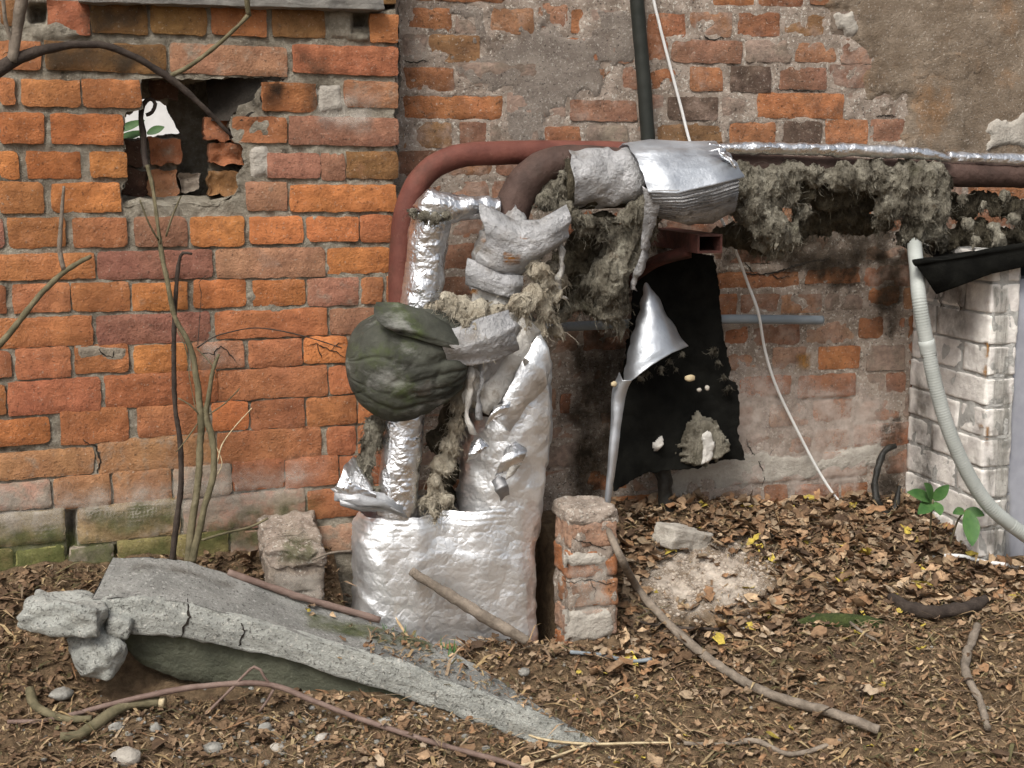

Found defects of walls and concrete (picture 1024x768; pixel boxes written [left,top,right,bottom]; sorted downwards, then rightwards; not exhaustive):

peeling [833,11,858,37]
spalling [121,75,285,207]
leakage [724,231,902,335]
crack [307,343,345,358]